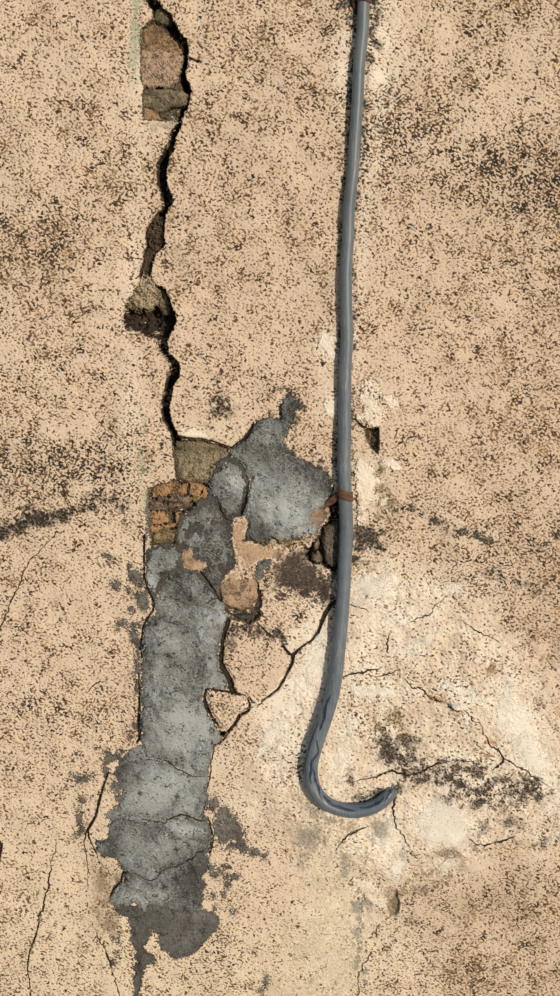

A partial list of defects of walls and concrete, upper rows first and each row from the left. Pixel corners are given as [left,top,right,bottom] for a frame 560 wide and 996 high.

crack [139,0,253,472]
spalling [144,429,231,573]
peeling [207,517,290,738]
crack [136,535,369,791]
damp [262,550,338,608]
spalling [303,501,340,573]
crack [343,596,552,788]
damp [475,565,554,600]
crack [392,798,412,849]
damp [345,706,555,852]
crack [468,836,516,847]
damp [276,899,373,996]